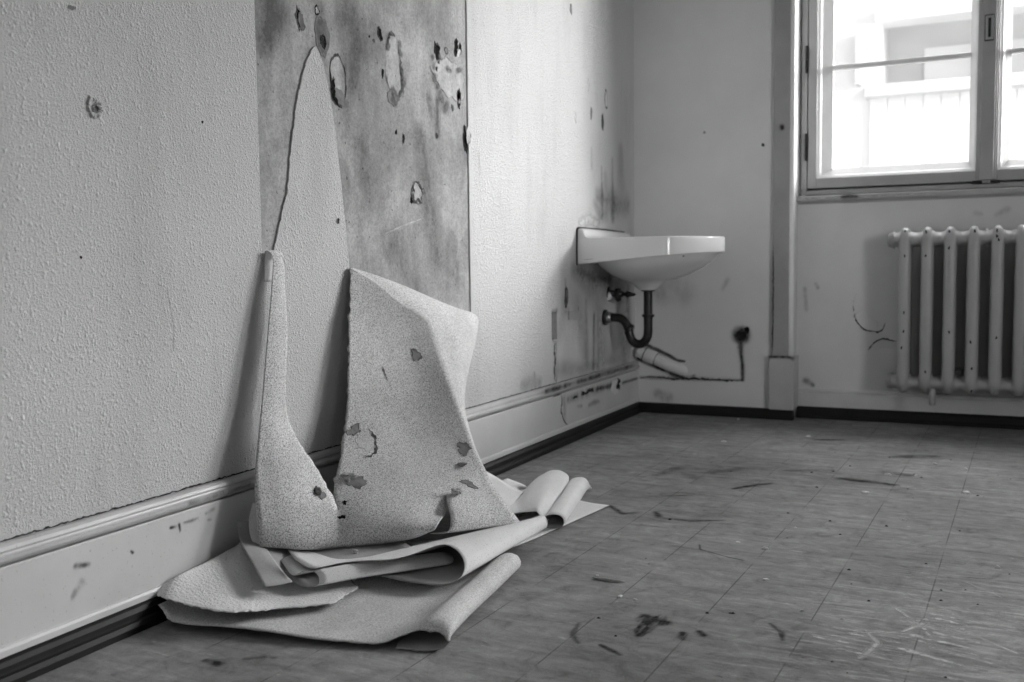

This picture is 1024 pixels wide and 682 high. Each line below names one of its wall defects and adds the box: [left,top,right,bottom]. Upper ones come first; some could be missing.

peeling [254,0,471,454]
damp [545,322,632,393]